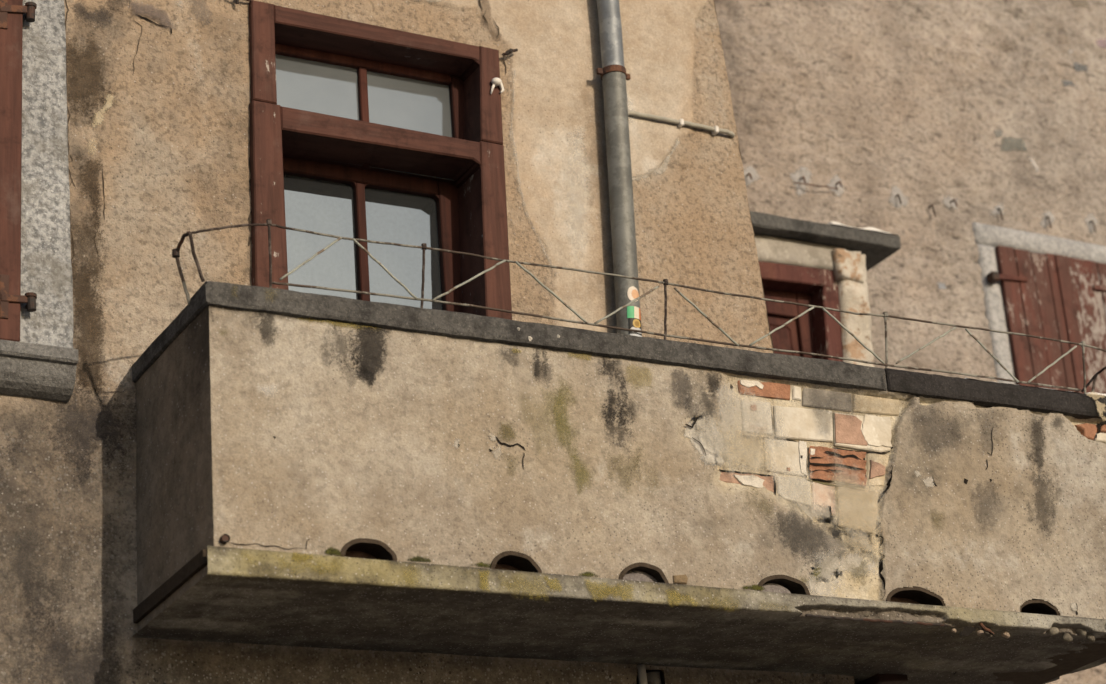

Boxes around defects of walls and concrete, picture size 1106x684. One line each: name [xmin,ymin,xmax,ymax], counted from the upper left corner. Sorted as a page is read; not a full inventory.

crack [479,0,506,75]
leakage [66,36,116,125]
leakage [77,156,103,228]
leakage [351,326,391,385]
leakage [49,343,136,479]
crack [495,435,525,469]
leakage [603,357,628,447]
flaking render [684,380,900,546]
leakage [1029,420,1045,471]
crack [875,465,893,599]
flaking render [809,554,839,590]